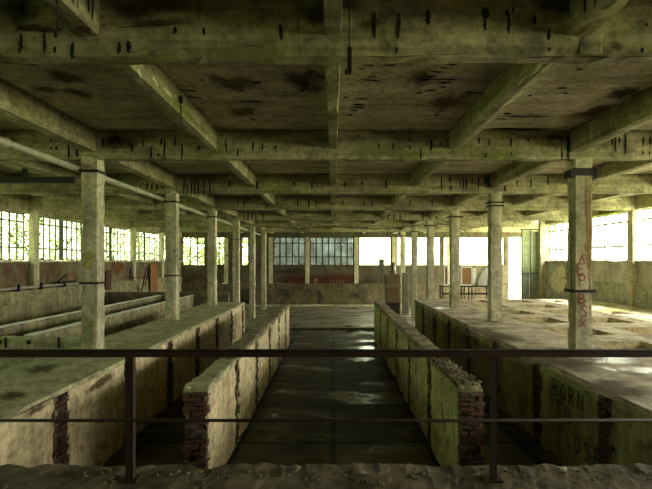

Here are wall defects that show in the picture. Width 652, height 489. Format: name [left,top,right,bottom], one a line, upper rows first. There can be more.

water stain [213,77,255,90]
flaking render [51,393,69,465]
flaking render [597,394,615,464]